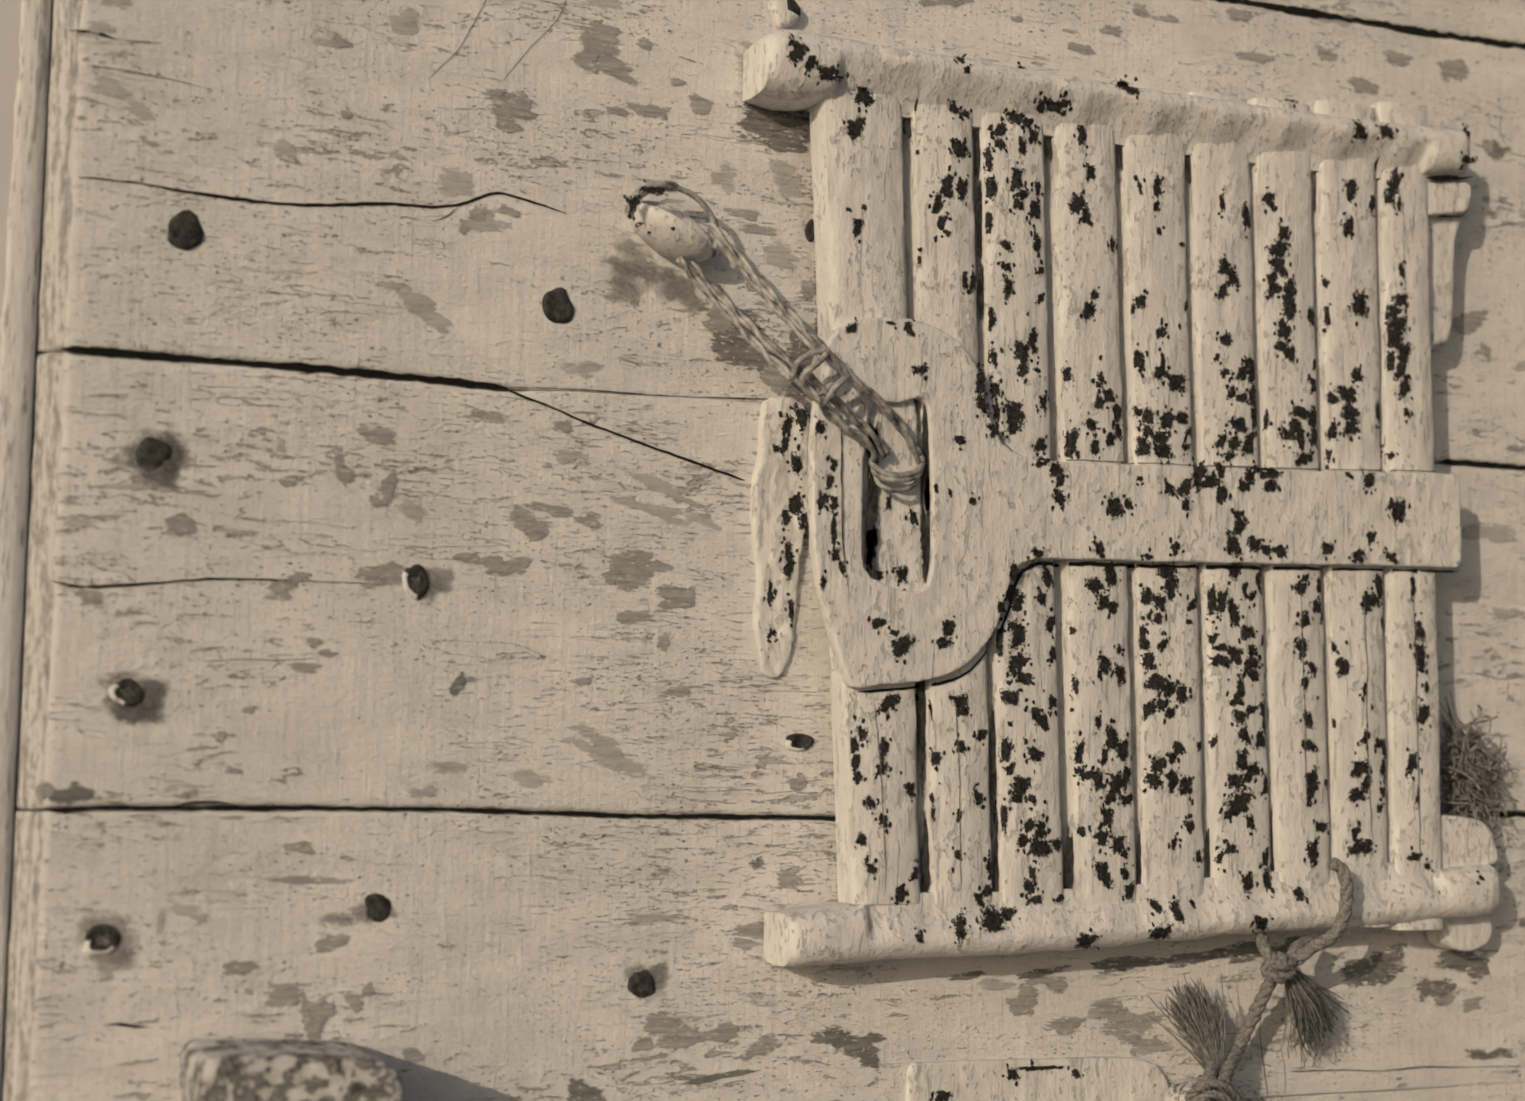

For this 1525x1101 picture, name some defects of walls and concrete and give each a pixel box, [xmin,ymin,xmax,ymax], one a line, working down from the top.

peeling [481,89,537,133]
peeling [571,0,671,120]
peeling [671,78,714,115]
peeling [732,101,813,203]
crack [78,177,567,221]
crack [61,345,765,481]
peeling [610,468,721,531]
peeling [452,501,604,577]
crack [50,578,366,589]
peeling [601,549,696,651]
peeling [631,1012,779,1085]
peeling [809,1025,886,1073]